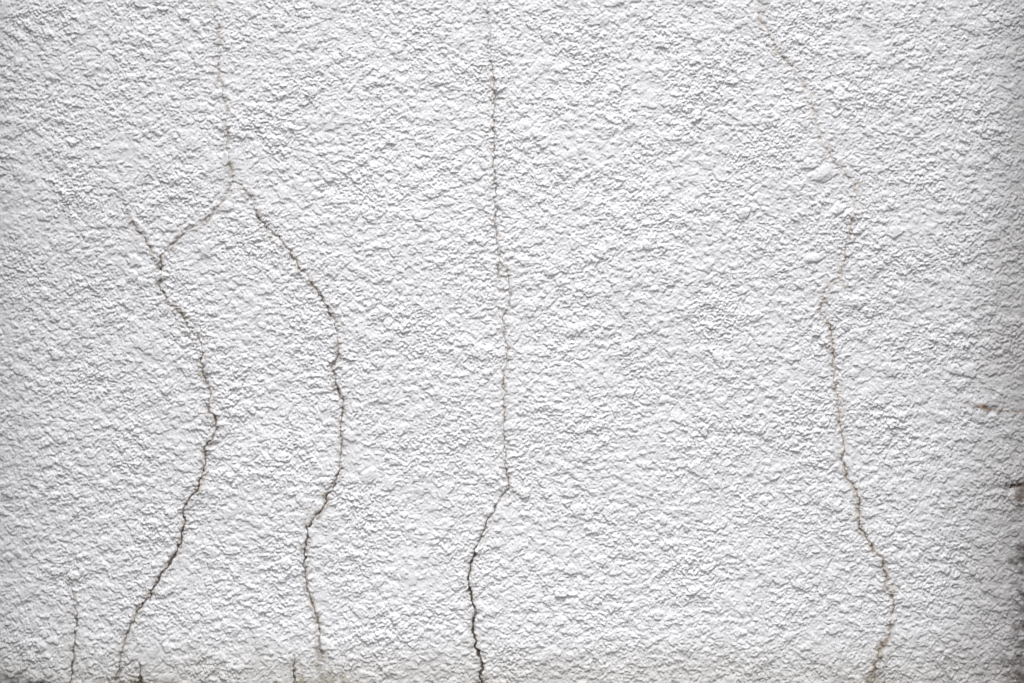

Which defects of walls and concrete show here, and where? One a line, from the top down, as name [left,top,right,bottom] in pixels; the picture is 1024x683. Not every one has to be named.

crack [119,236,217,683]
crack [229,164,344,648]
crack [467,355,510,682]
crack [841,438,893,597]